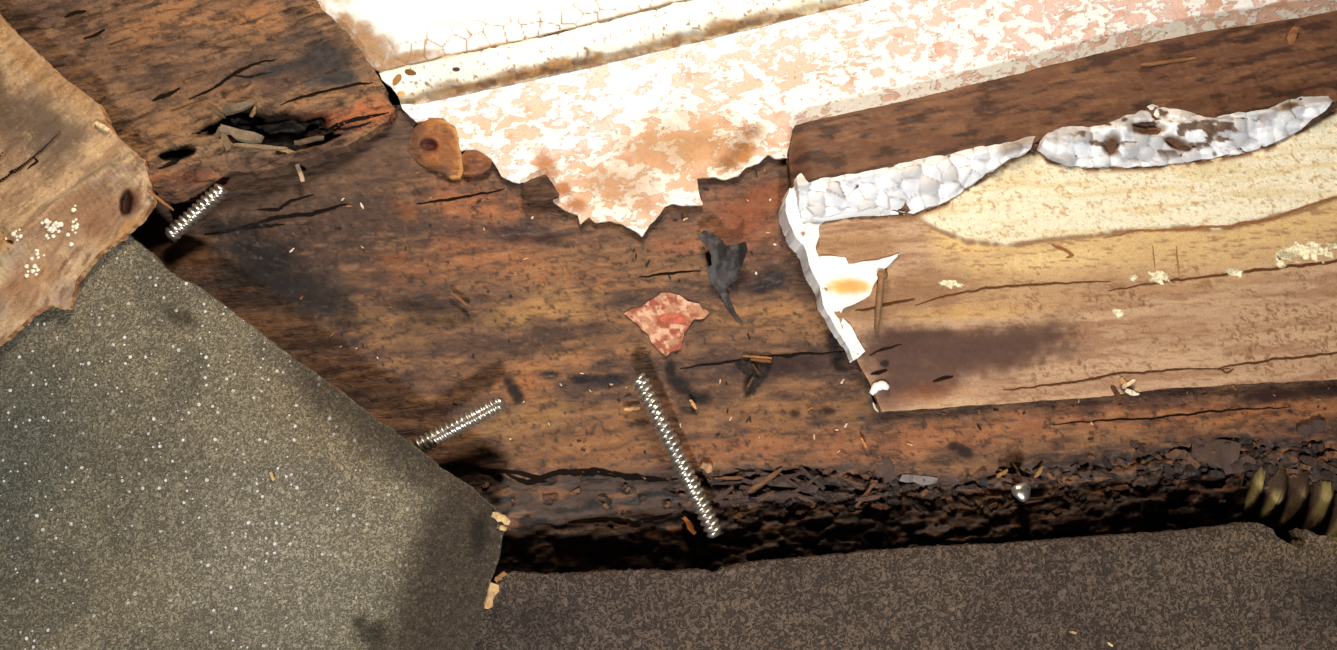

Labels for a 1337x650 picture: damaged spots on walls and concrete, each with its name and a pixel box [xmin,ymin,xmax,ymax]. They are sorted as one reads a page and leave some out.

spalling [392,69,416,97]
spalling [206,98,333,155]
crack [0,134,58,182]
crack [855,197,1337,311]
crack [680,344,902,375]
crack [933,374,954,382]
crack [1006,352,1337,390]
crack [1050,407,1288,425]